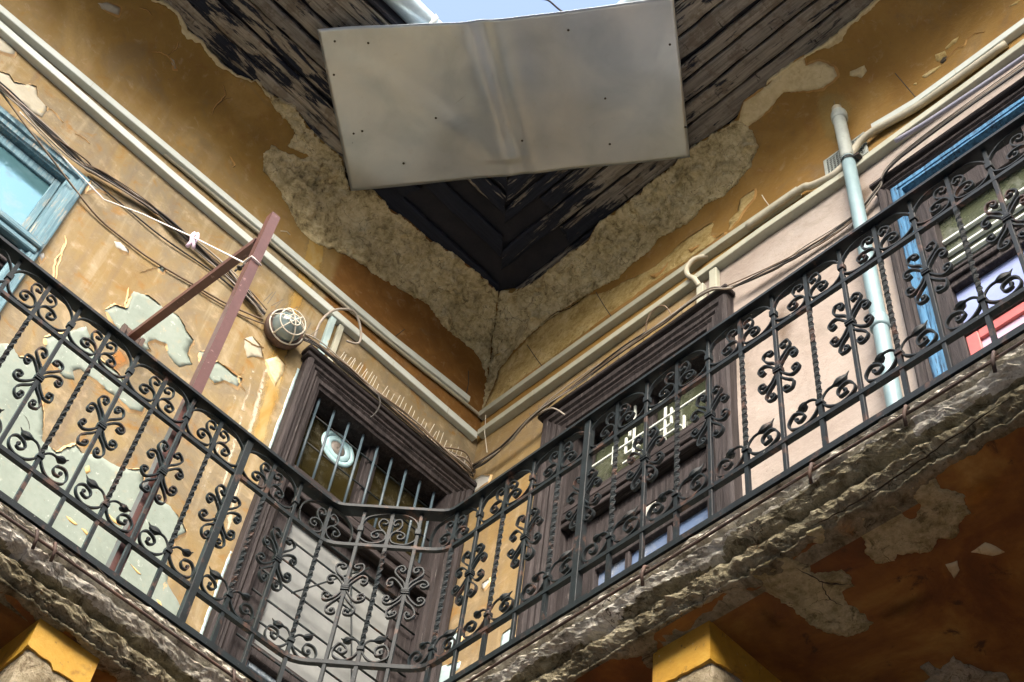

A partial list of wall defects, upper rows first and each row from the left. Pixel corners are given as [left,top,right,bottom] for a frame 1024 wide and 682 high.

peeling [0,71,49,117]
flaking render [151,0,880,409]
peeling [43,326,146,416]
peeling [105,291,204,367]
peeling [244,336,300,448]
peeling [0,343,145,565]
spalling [466,339,1024,682]
spalling [0,500,243,682]
crack [798,569,845,605]